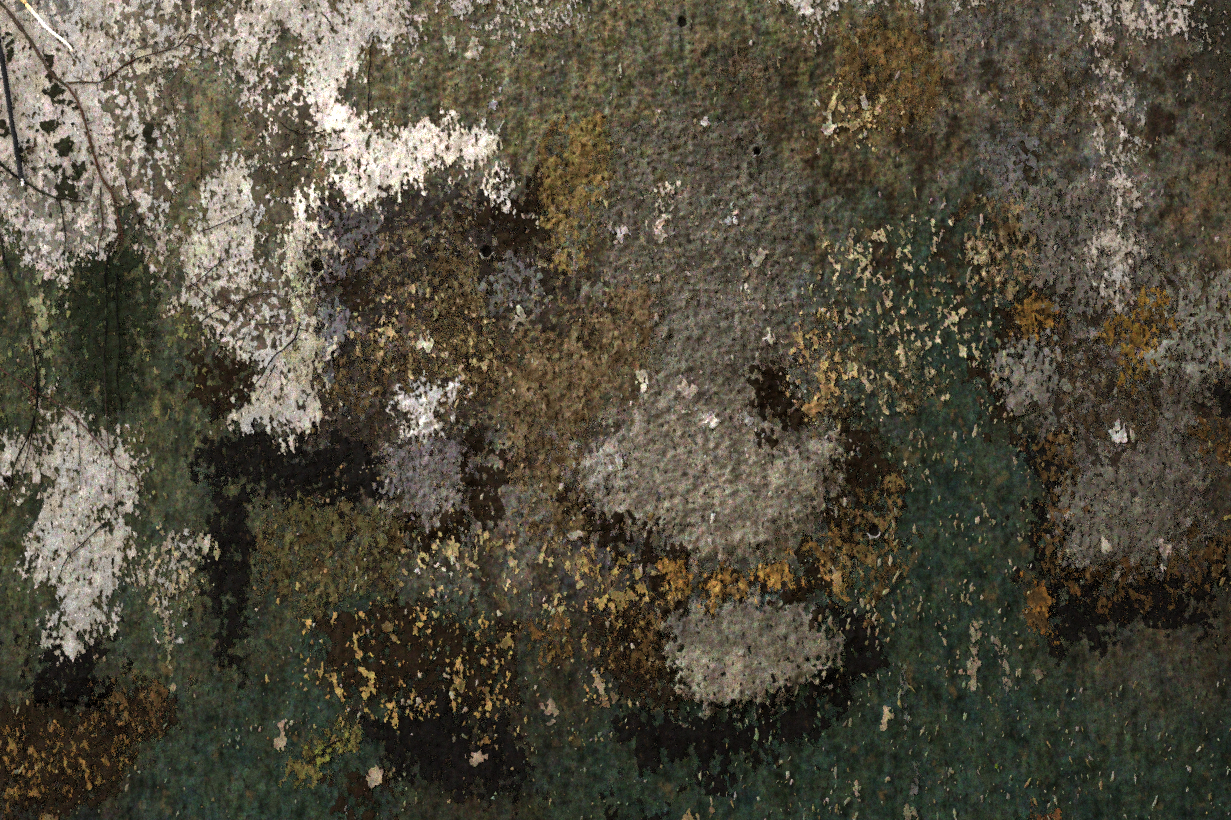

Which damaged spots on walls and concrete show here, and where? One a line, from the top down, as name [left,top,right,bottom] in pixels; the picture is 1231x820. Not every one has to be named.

peeling [0,0,591,521]
peeling [5,713,140,798]
peeling [0,376,220,666]
peeling [274,719,289,751]
peeling [298,519,681,767]
flaking render [573,438,638,506]